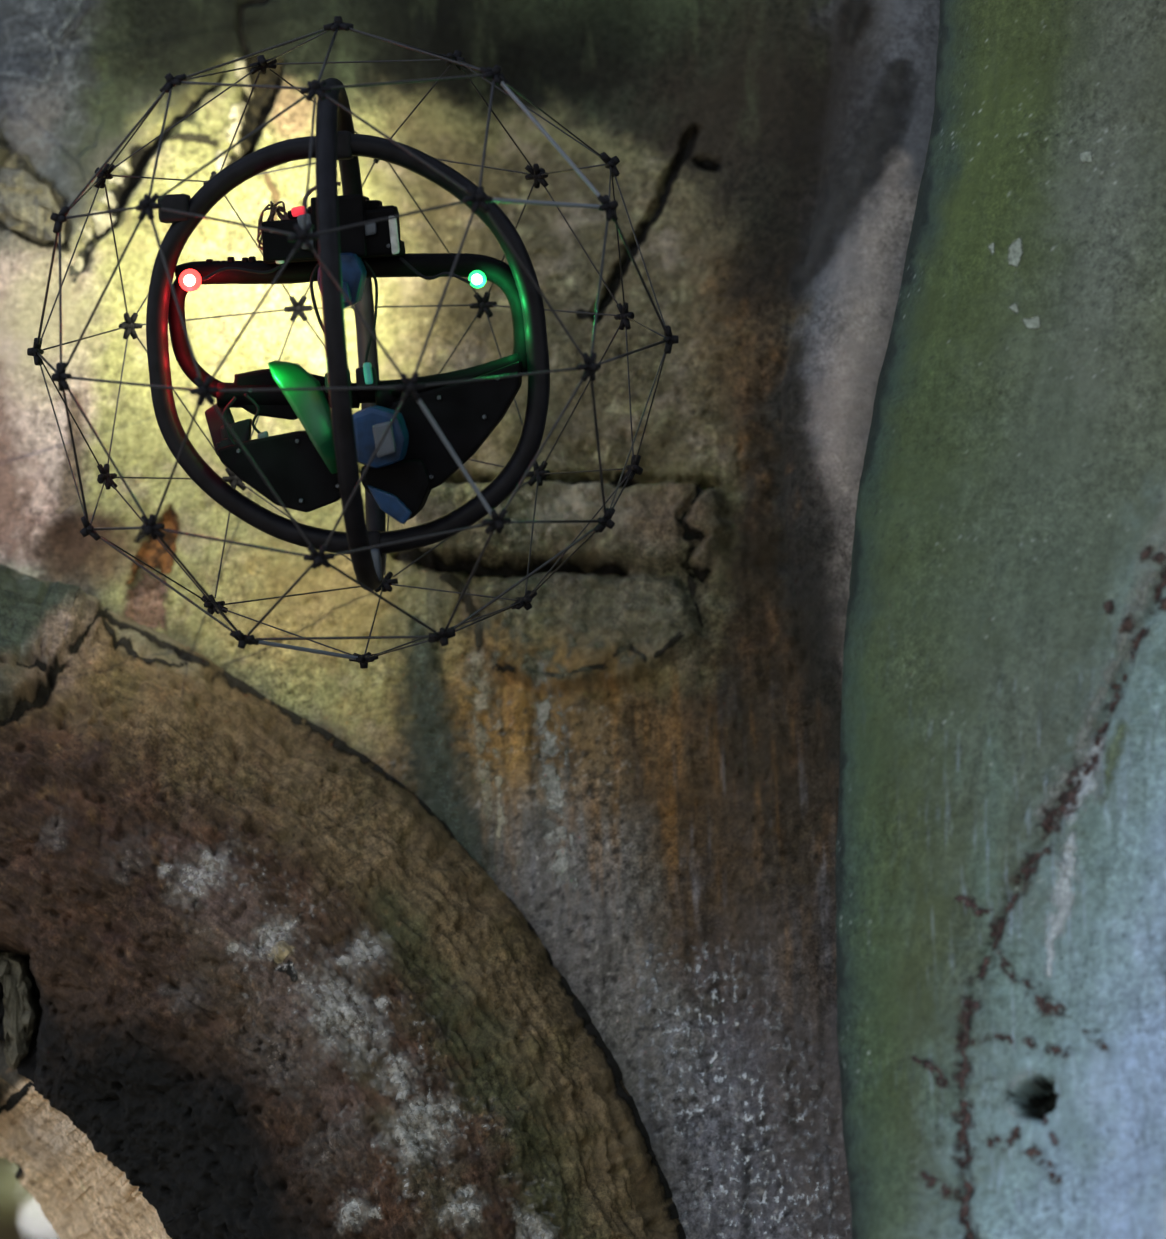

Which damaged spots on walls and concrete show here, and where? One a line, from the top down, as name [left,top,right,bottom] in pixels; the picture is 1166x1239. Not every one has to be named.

spalling [0,130,71,252]
crack [69,0,283,283]
crack [576,125,698,322]
crack [444,476,492,484]
crack [394,548,627,652]
crack [544,472,714,627]
crack [0,607,469,853]
crack [509,897,686,1239]